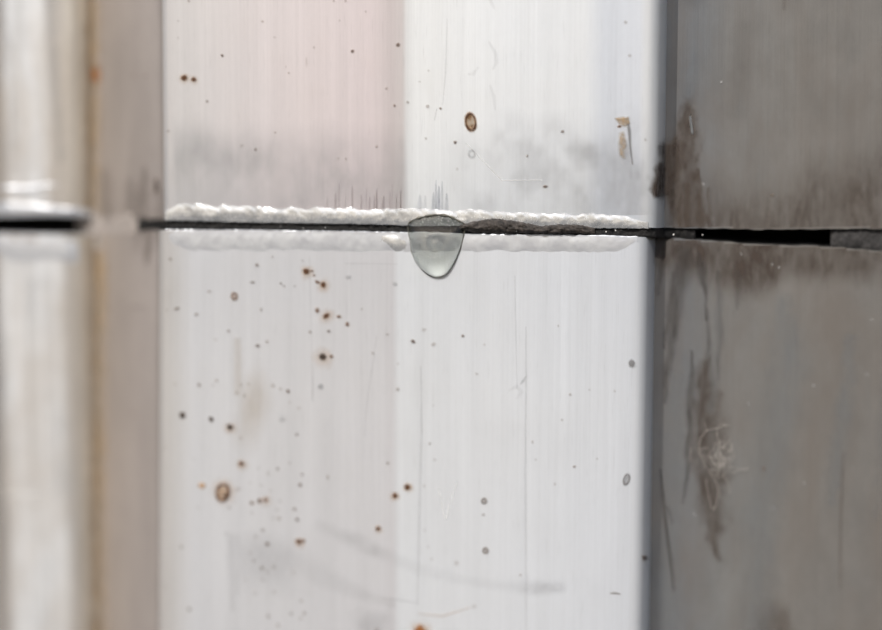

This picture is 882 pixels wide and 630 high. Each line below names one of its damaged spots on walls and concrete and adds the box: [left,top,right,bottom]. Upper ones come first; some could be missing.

rust [465,112,476,131]
leakage [653,105,710,227]
rust [216,484,230,501]
leakage [688,364,723,556]